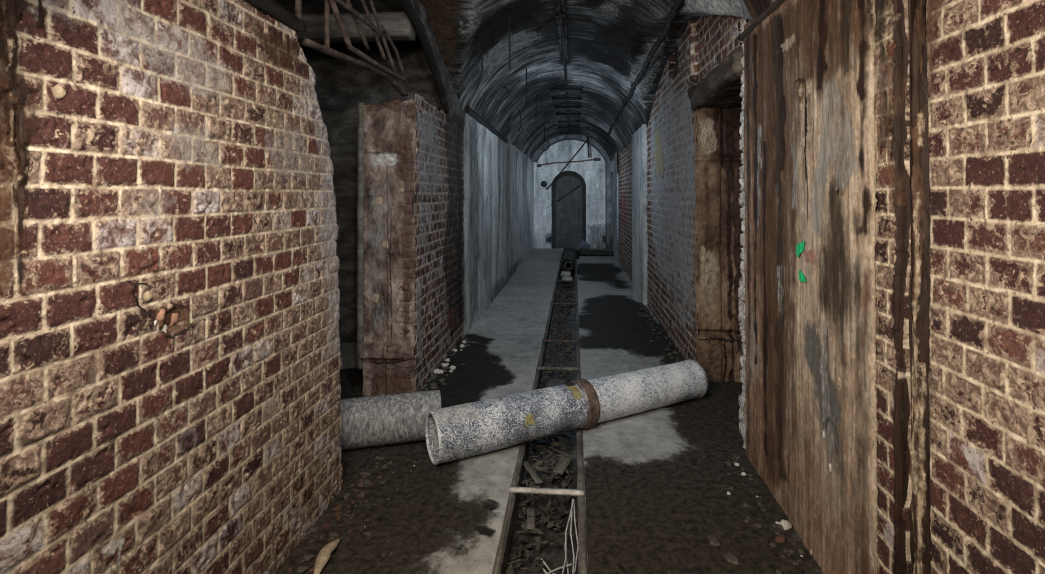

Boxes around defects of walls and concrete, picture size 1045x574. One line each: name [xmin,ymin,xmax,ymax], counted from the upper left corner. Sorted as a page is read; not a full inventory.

leakage [471,11,539,51]
leakage [578,49,630,75]
spalling [143,291,190,334]
leakage [420,112,520,408]
leakage [577,88,824,574]
leakage [804,84,857,481]
leakage [868,0,887,574]